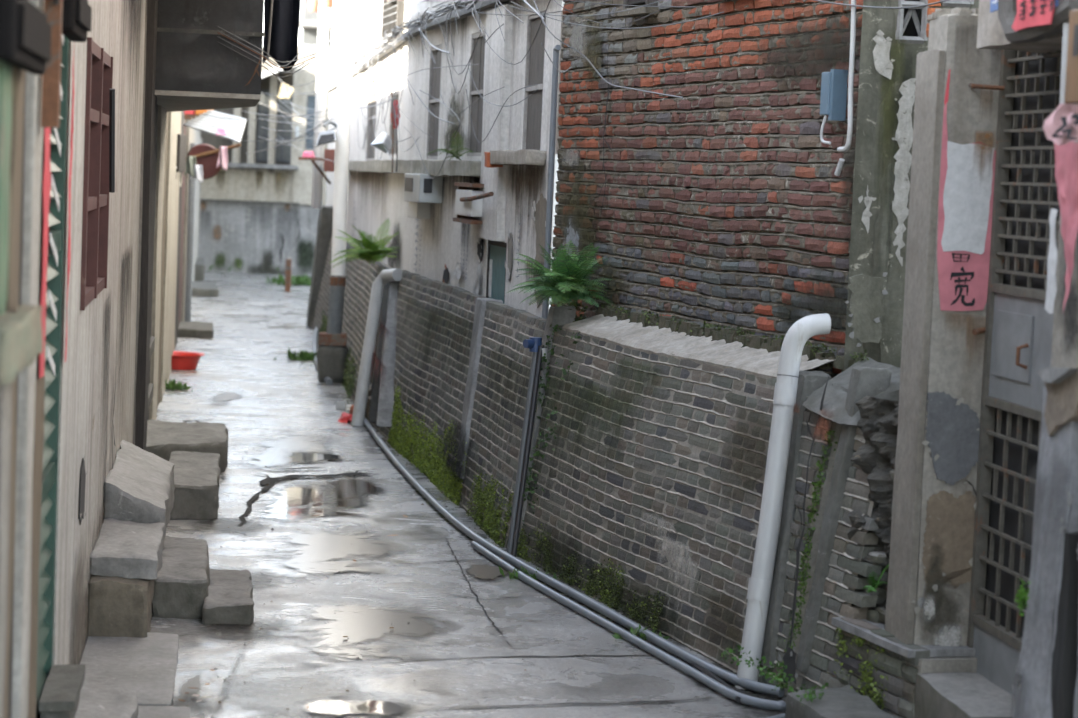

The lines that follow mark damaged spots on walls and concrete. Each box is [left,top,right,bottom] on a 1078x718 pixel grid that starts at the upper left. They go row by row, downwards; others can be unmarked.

spalling [845,272,888,347]
peeling [858,186,876,233]
peeling [873,30,916,267]
damp [439,424,472,480]
spalling [848,396,899,624]
flaking render [911,391,981,615]